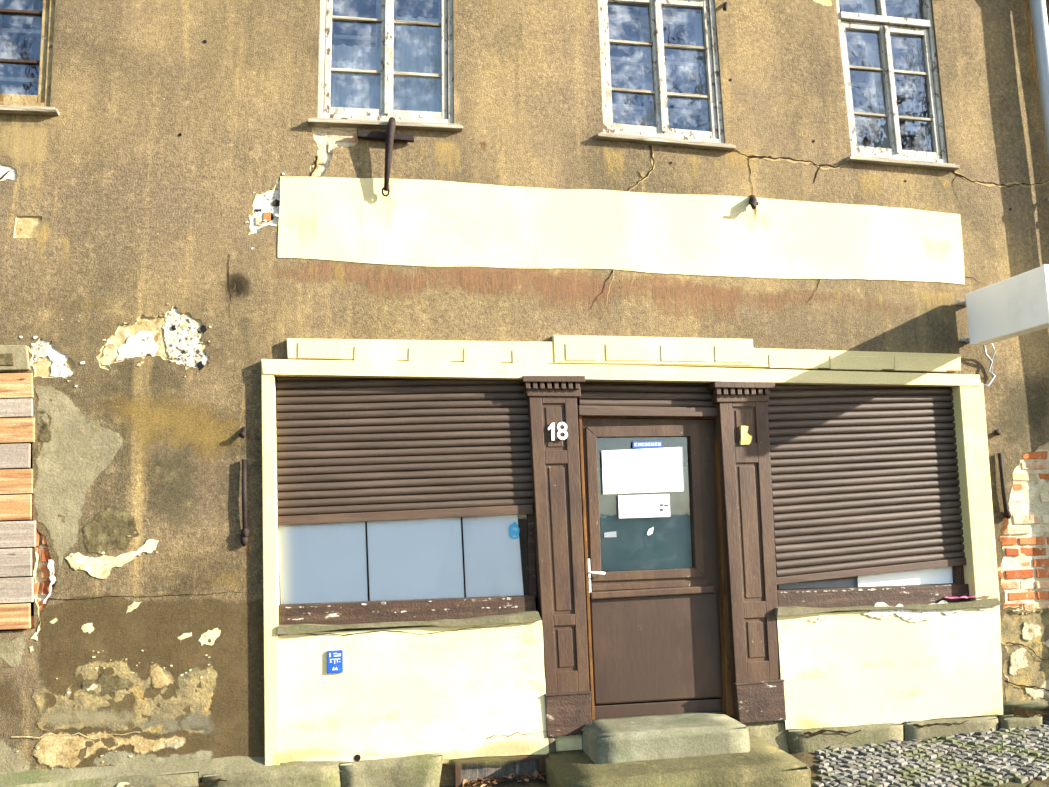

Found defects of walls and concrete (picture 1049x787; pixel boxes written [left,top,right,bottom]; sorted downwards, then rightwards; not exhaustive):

peeling [0,126,46,188]
spalling [14,216,43,238]
spalling [246,172,285,249]
spalling [310,118,358,177]
crack [627,145,655,192]
crack [734,150,845,194]
crack [952,171,1049,209]
peeling [19,301,211,387]
spalling [24,504,158,652]
spalling [780,442,1049,702]
peeling [12,628,221,770]